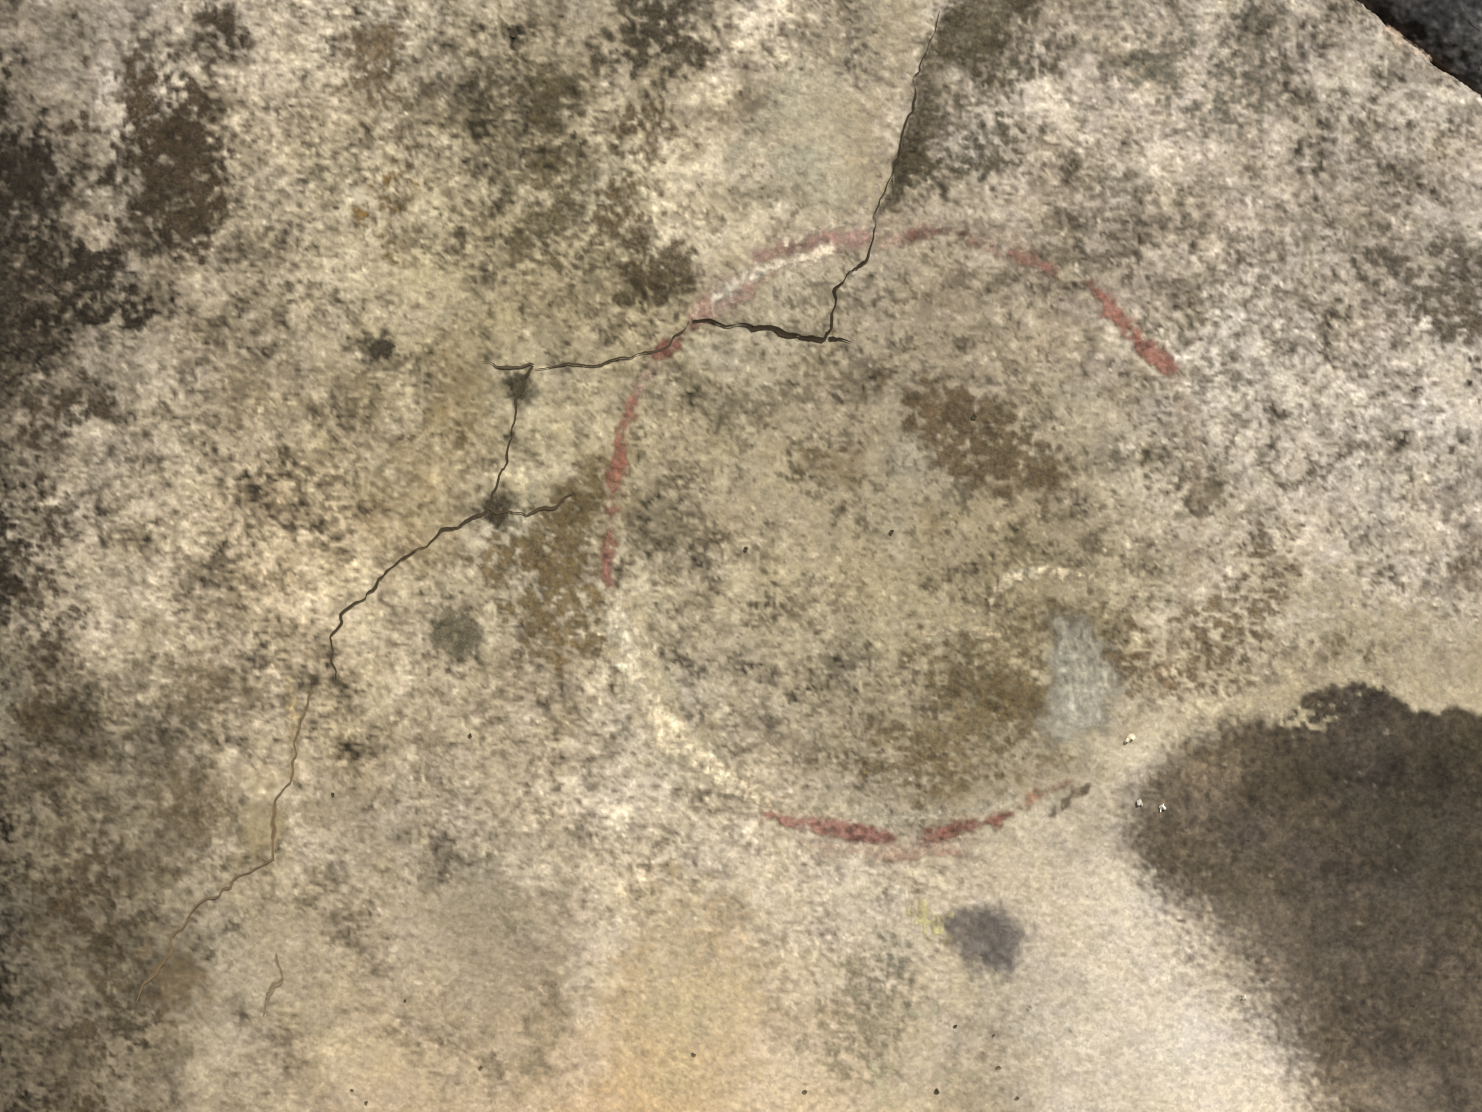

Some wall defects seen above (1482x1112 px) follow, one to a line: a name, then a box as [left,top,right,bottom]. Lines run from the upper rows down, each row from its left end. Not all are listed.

water stain [0,2,252,1112]
crack [133,11,940,1016]
water stain [1129,682,1482,1112]
water stain [1310,626,1389,663]